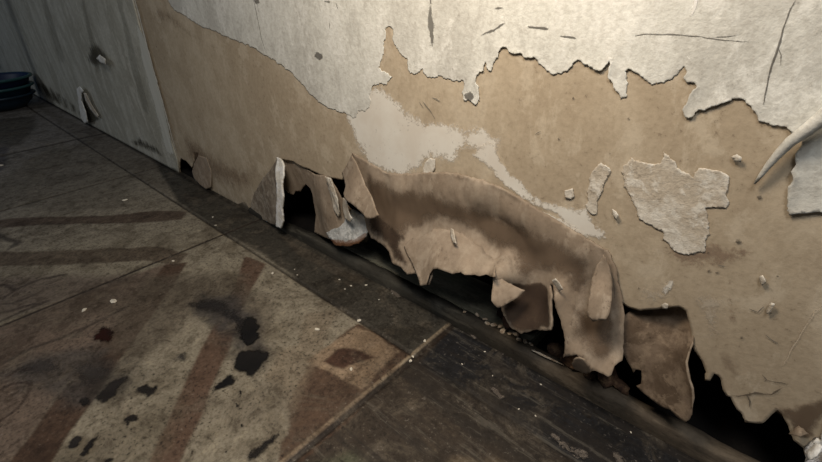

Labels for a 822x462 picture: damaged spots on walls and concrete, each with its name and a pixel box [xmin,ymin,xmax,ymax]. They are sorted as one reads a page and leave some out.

peeling [168,0,822,242]
peeling [621,153,729,255]
flaking render [804,433,822,462]